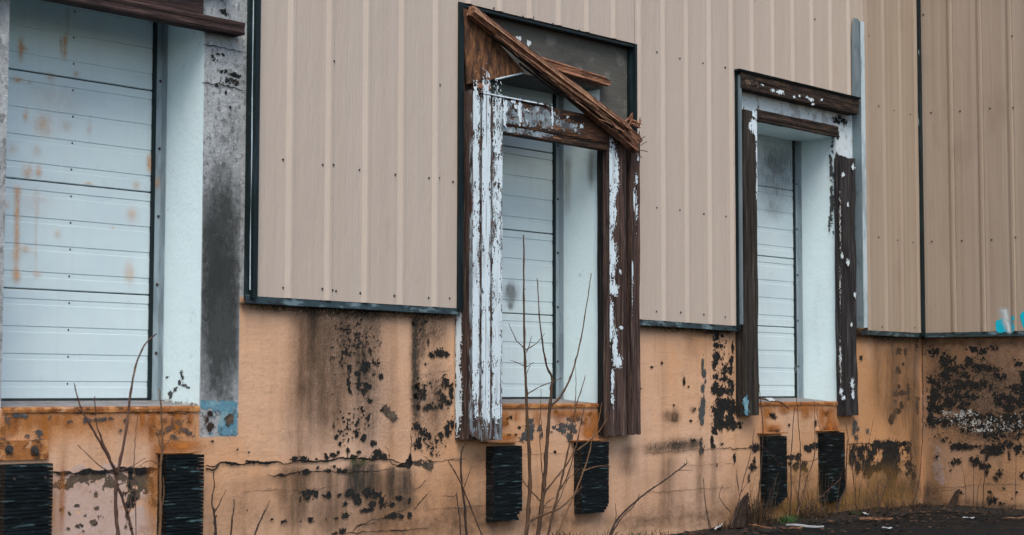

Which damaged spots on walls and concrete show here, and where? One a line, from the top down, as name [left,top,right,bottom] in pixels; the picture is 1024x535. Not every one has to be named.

peeling [827,114,854,268]
water stain [202,188,238,395]
peeling [280,67,592,477]
peeling [609,137,633,409]
peeling [49,462,158,535]
corrosion [140,414,197,459]
crack [206,437,482,534]
water stain [256,304,452,421]
peeling [839,346,855,407]
water stain [858,335,965,465]